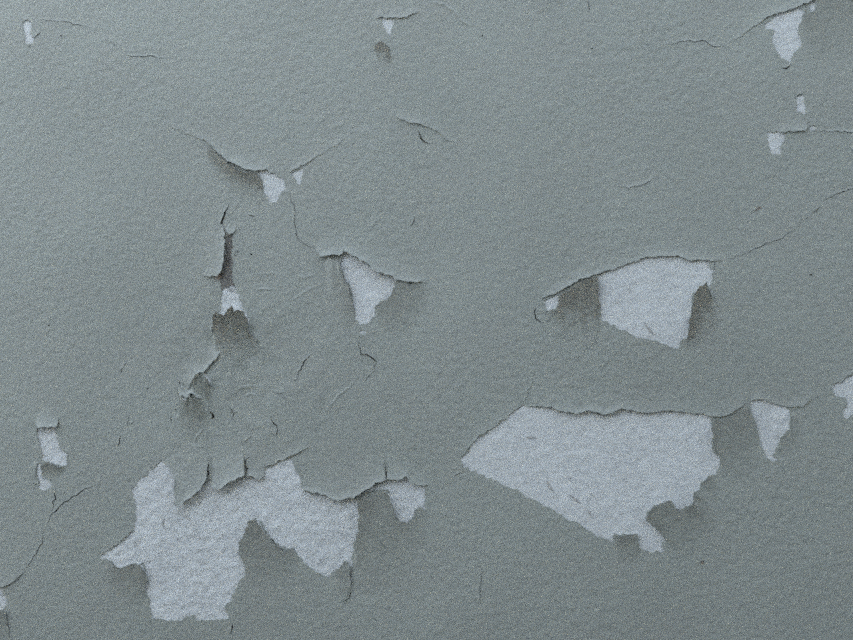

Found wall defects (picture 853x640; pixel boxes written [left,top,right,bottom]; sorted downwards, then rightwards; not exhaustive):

peeling [22,13,89,50]
peeling [373,2,420,68]
peeling [730,0,853,69]
peeling [767,86,853,154]
peeling [170,118,428,382]
crack [725,186,853,259]
peeling [534,241,725,351]
peeling [28,406,76,491]
peeling [99,204,430,621]
peeling [453,370,813,564]
peeling [832,364,853,419]
crack [4,484,97,588]